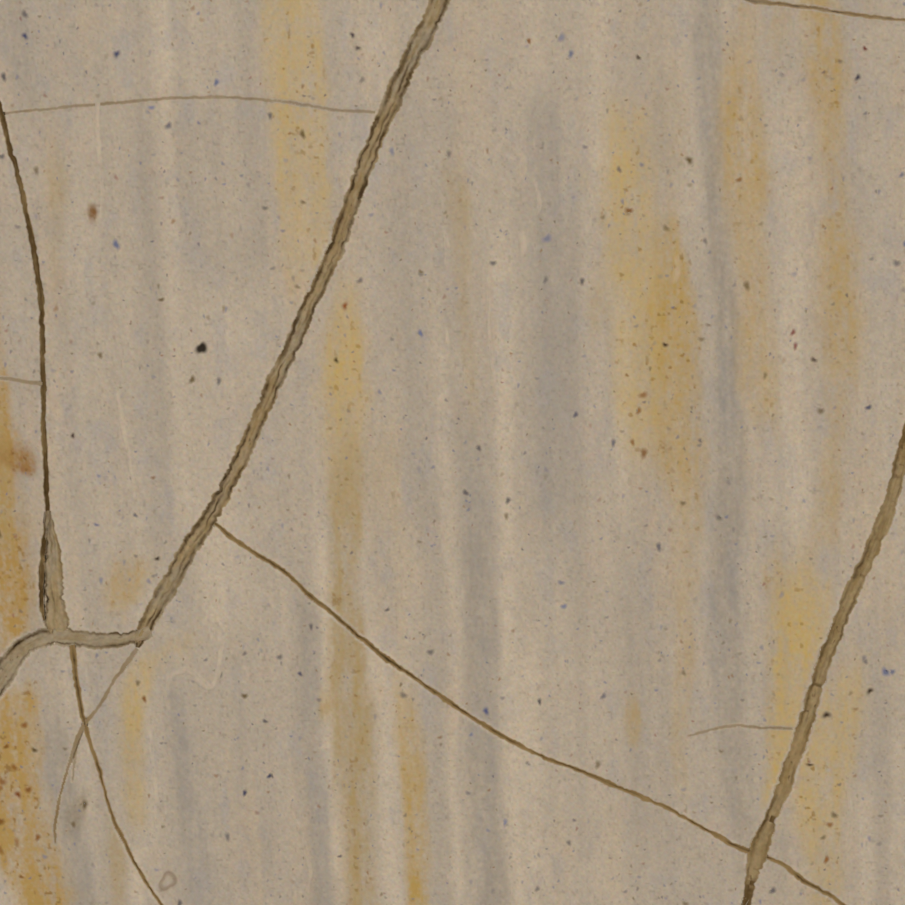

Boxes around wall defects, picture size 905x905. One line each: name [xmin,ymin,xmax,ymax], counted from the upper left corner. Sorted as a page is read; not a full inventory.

crack [736,0,905,24]
crack [0,0,457,905]
crack [214,410,905,905]